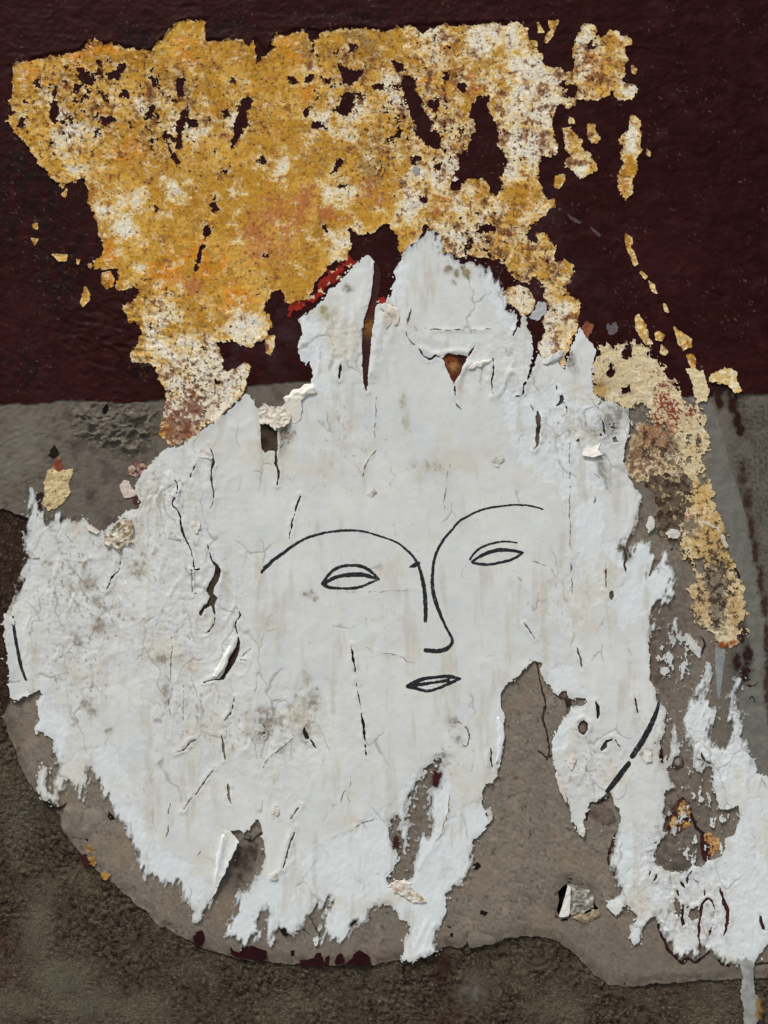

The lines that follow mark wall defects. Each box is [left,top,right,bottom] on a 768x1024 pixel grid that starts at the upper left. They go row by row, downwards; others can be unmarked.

corrosion [581,321,594,338]
corrosion [708,382,745,435]
crack [172,447,215,594]
crack [205,611,251,661]
crack [260,723,317,768]
peeling [496,717,505,764]
peeling [555,773,567,803]
crack [283,807,299,868]
peeling [664,796,720,862]
flaking render [553,878,600,923]
flaking render [467,931,496,948]